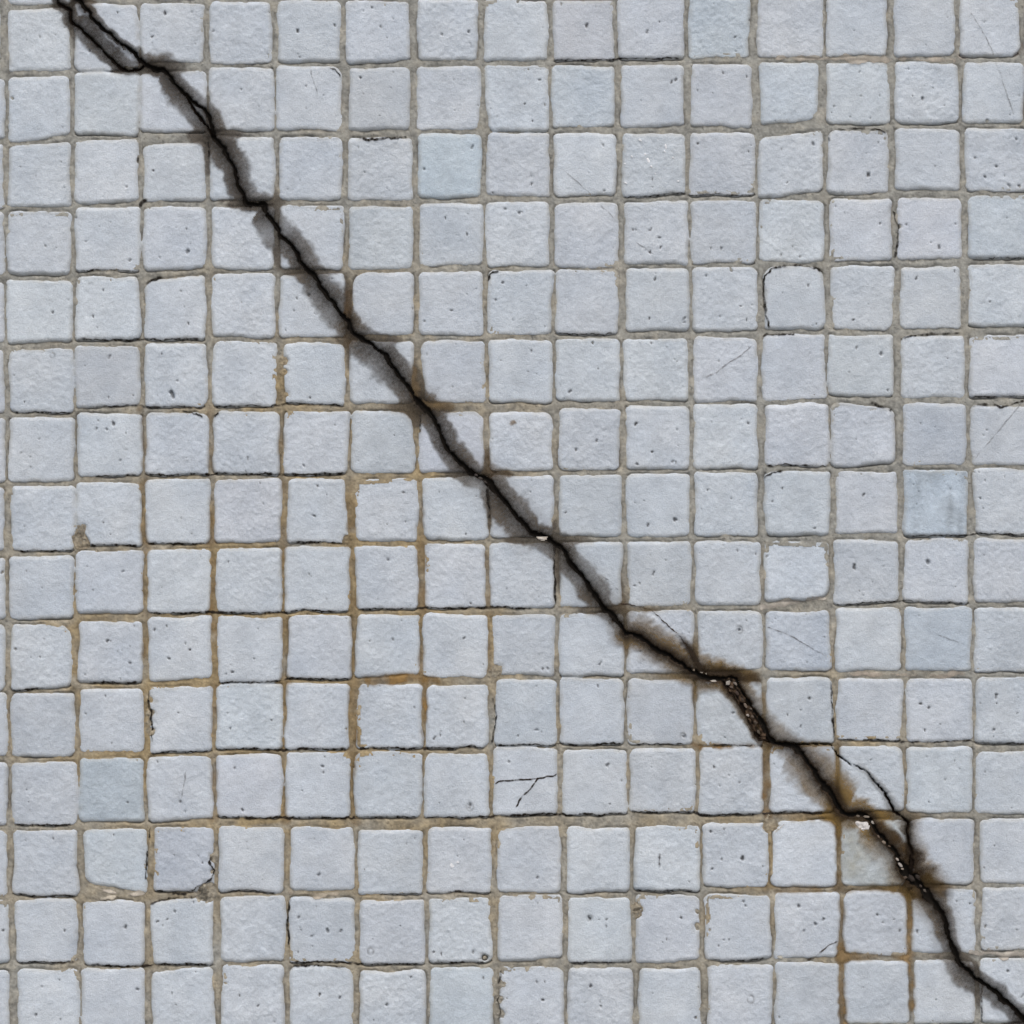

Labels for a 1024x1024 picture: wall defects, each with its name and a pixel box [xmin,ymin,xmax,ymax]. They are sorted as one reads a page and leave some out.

damp [52,0,629,625]
crack [83,336,198,344]
crack [96,470,343,478]
crack [20,542,202,552]
crack [151,606,530,615]
crack [222,676,348,684]
crack [93,681,682,754]
crack [396,774,822,819]
crack [222,814,355,822]
crack [145,829,501,1013]
damp [919,884,1024,1024]
crack [21,960,206,968]